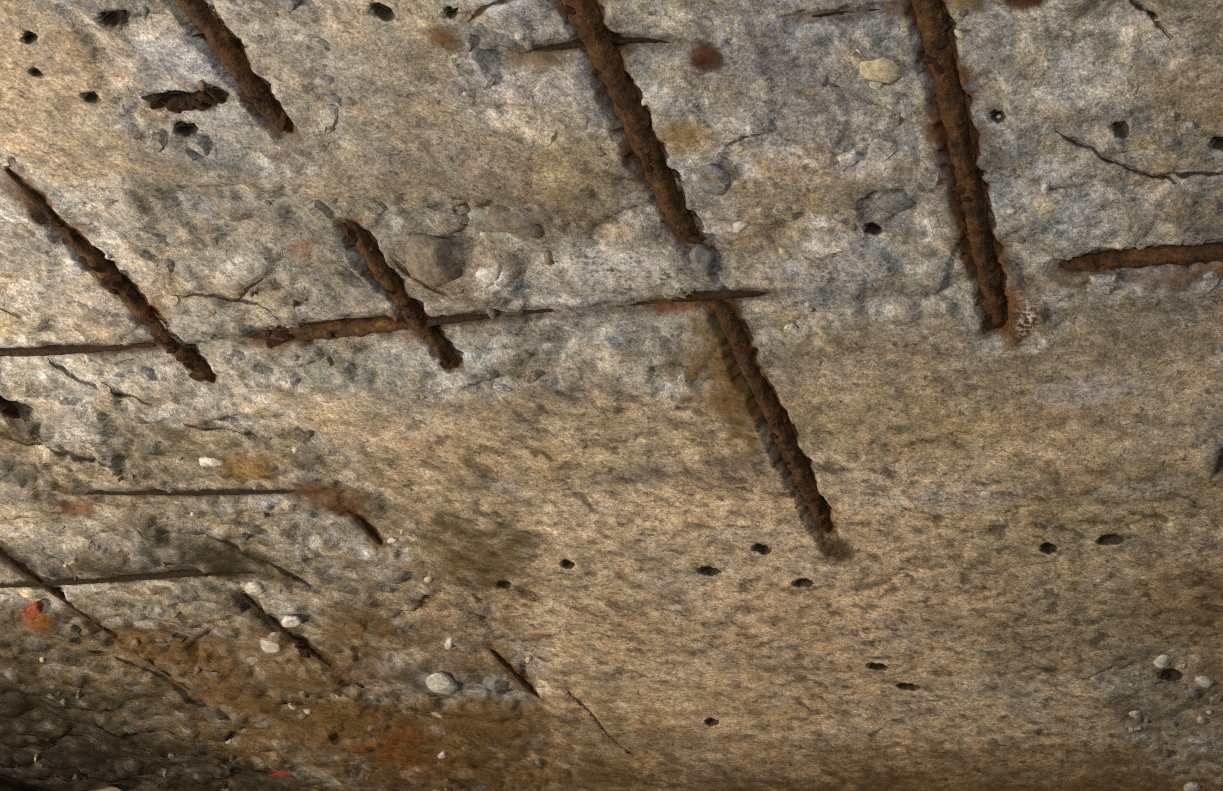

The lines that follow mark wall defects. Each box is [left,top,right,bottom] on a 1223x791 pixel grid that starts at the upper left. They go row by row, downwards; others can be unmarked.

crack [1129,0,1171,40]
corrosion [691,45,722,71]
corrosion [242,75,298,137]
corrosion [6,176,58,231]
corrosion [617,127,645,173]
corrosion [925,0,1043,346]
corrosion [338,219,404,285]
corrosion [97,249,169,326]
corrosion [436,311,514,373]
corrosion [631,288,848,562]
corrosion [115,457,389,547]
corrosion [0,541,251,633]